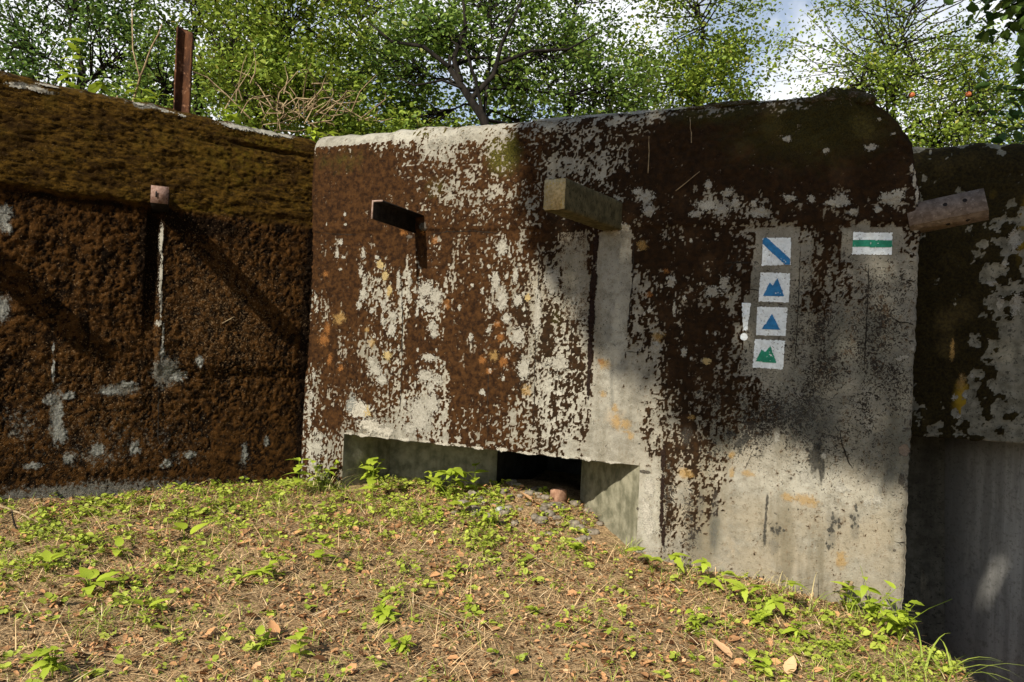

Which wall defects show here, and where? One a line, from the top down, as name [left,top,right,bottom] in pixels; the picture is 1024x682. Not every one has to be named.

peeling [631,187,656,217]
peeling [688,179,770,218]
peeling [783,192,858,216]
peeling [873,164,919,213]
efflorescence [154,223,164,345]
peeling [470,237,586,385]
peeling [656,274,687,316]
peeling [699,272,730,298]
spalling [344,246,483,450]
peeling [680,331,712,365]
peeling [306,364,328,477]
spalling [496,447,592,462]